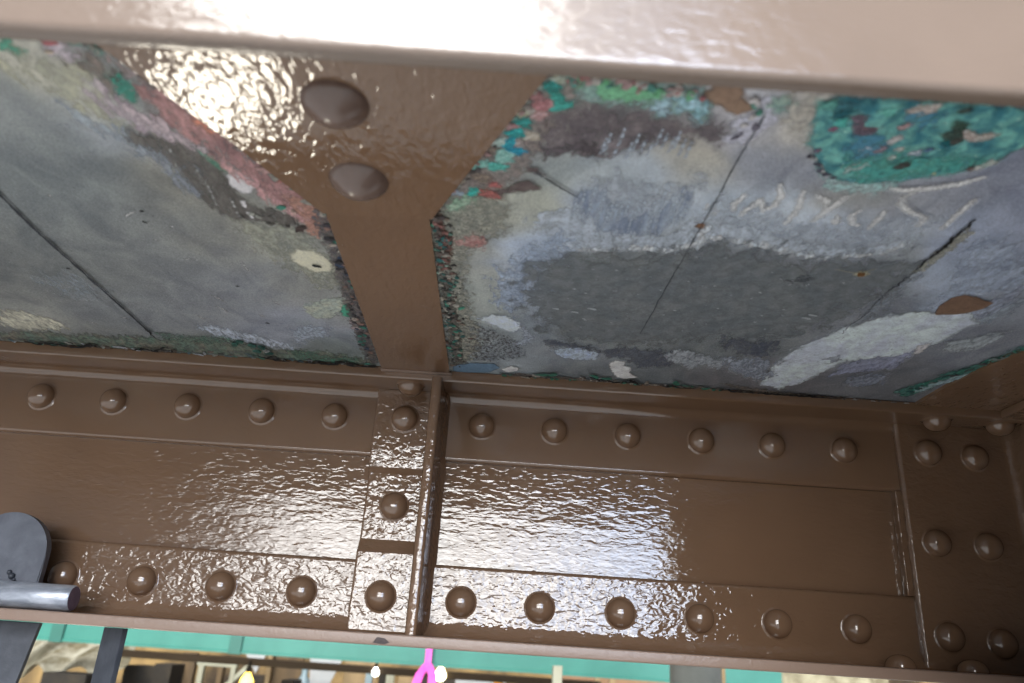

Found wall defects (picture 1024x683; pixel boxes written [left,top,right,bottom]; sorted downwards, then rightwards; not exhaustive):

crack [842,220,975,334]